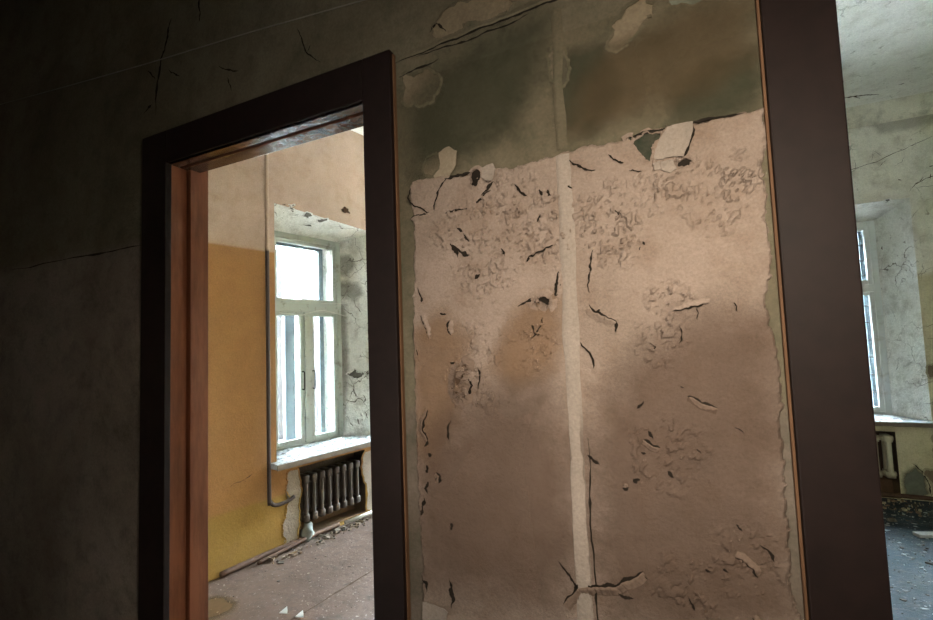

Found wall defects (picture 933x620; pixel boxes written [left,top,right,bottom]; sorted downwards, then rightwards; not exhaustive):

peeling [421,146,496,195]
crack [514,155,641,222]
peeling [621,112,745,173]
crack [407,177,491,279]
crack [583,250,618,332]
crack [673,297,710,343]
crack [580,342,595,368]
peeling [874,413,928,422]
peeling [276,435,372,545]
crack [418,408,451,515]
crack [559,442,648,620]
peeling [422,580,455,620]